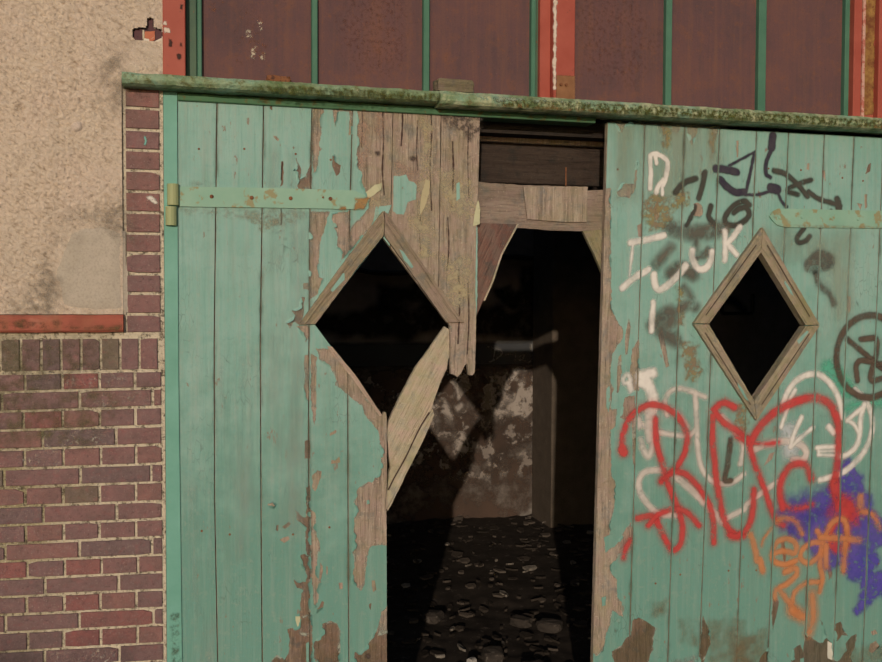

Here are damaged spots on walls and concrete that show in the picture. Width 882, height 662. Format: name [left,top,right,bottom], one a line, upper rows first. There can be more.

spalling [132,18,182,59]
peeling [280,108,534,592]
peeling [593,182,655,662]
peeling [271,470,328,662]
peeling [353,603,387,662]
peeling [698,617,712,662]
peeling [771,597,779,626]
peeling [791,620,857,662]